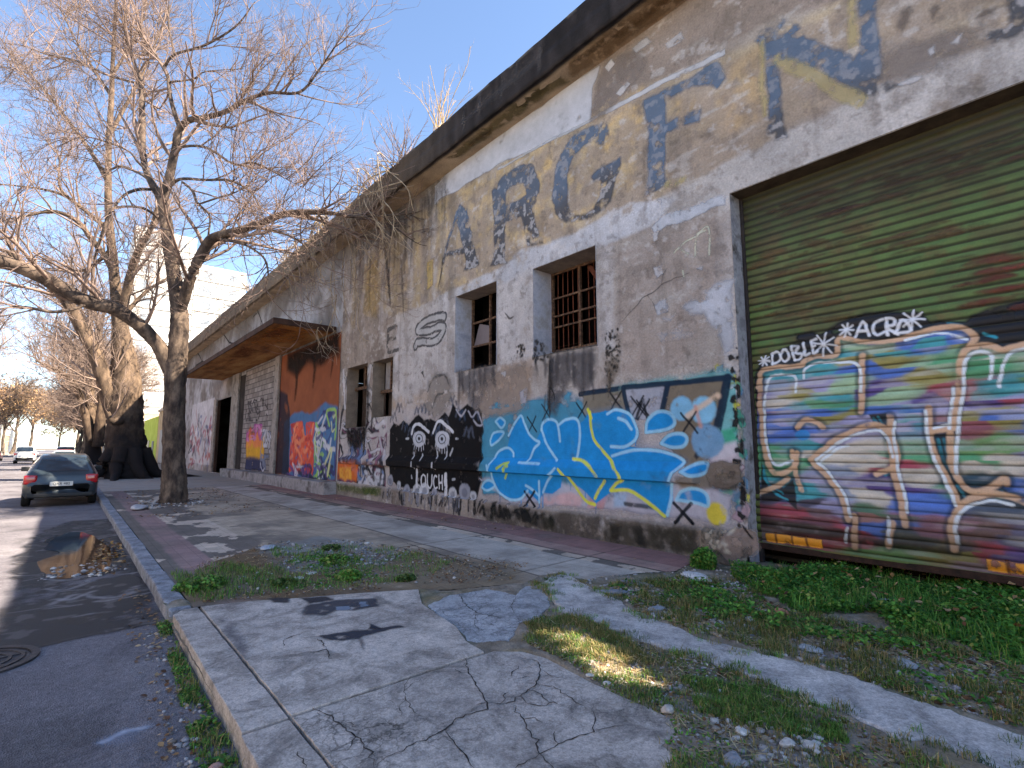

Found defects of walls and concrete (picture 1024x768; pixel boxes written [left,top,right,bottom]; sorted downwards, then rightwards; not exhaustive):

water stain [604,522,697,553]
crack [313,658,623,768]